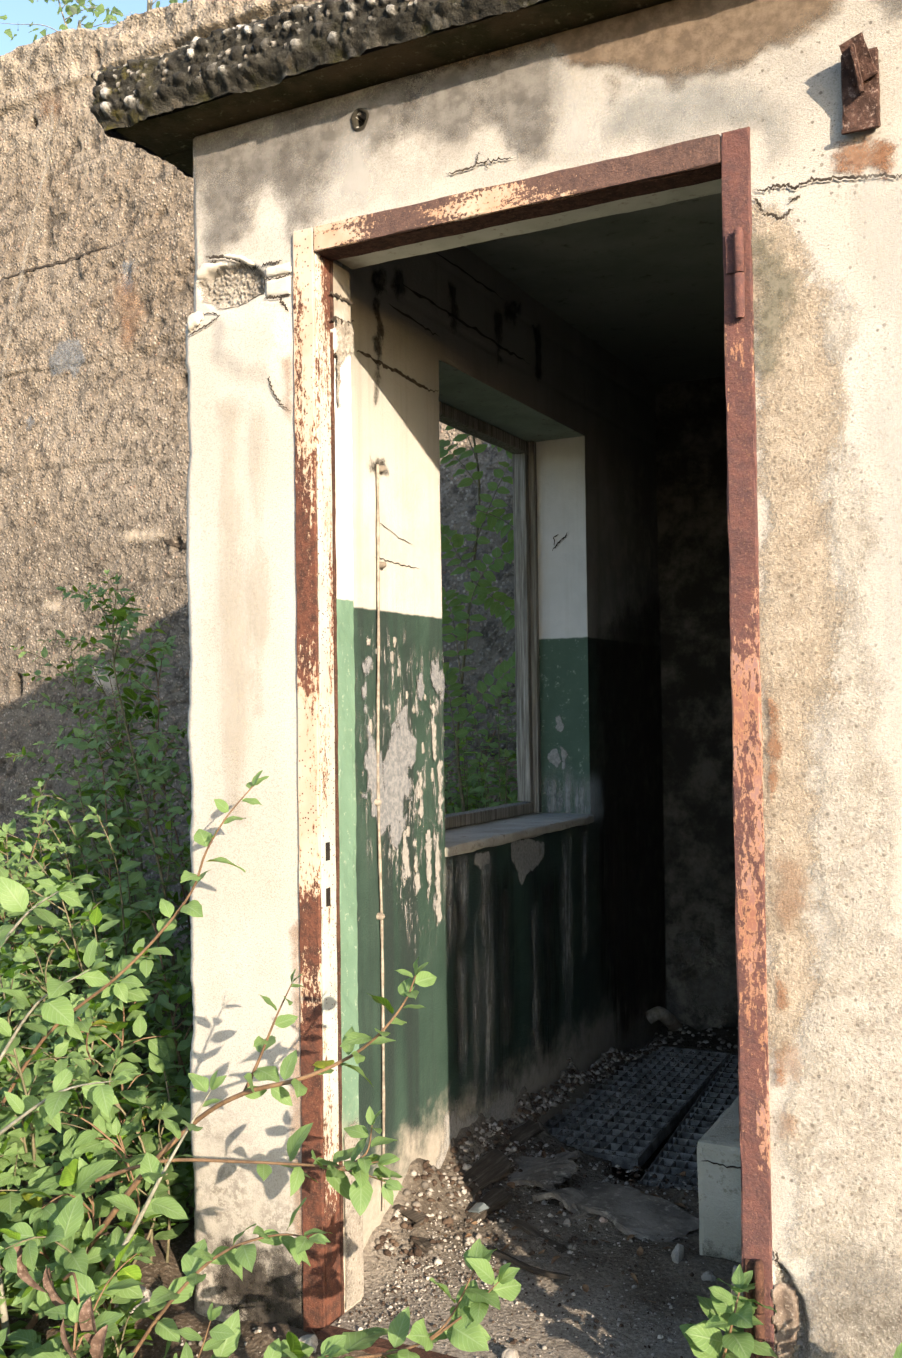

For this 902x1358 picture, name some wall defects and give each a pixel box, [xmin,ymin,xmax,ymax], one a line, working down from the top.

crack [446,152,514,175]
leakage [193,0,840,254]
crack [753,172,902,221]
corrosion [833,135,896,179]
spalling [187,254,293,333]
peeling [361,637,446,941]
peeling [474,851,490,869]
peeling [511,838,545,885]
leakage [534,597,667,1052]
spalling [752,199,902,1358]
leakage [447,860,514,1105]